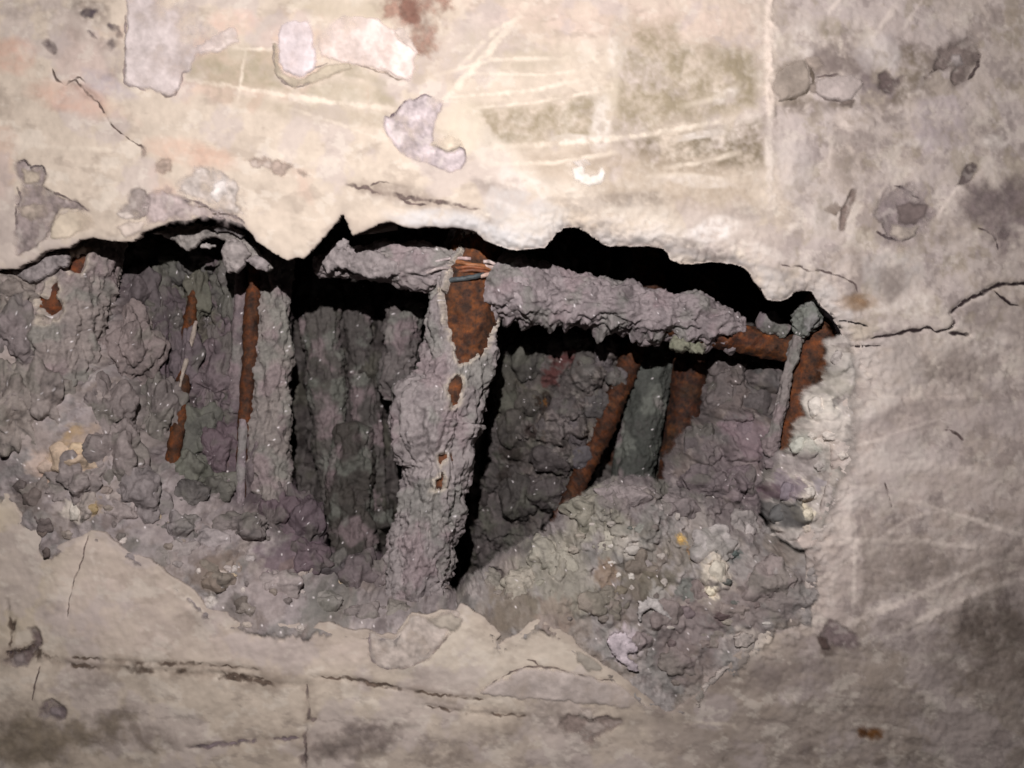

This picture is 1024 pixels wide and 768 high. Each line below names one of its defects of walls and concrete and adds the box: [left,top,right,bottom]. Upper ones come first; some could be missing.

crack [53,70,143,147]
peeling [108,0,238,97]
peeling [272,17,417,87]
spalling [384,94,466,172]
peeling [774,57,863,107]
crack [350,181,465,208]
spalling [874,186,932,240]
crack [821,282,1024,347]
spalling [0,157,857,719]
corrosion [662,349,785,515]
crack [136,662,272,686]
crack [197,676,450,763]